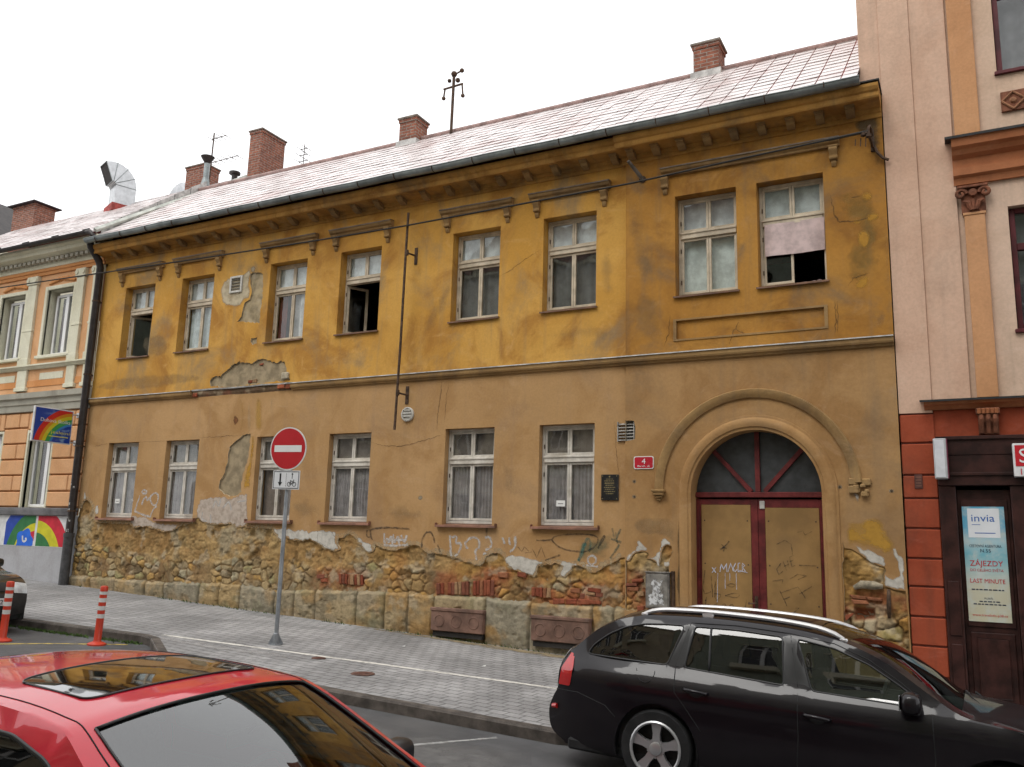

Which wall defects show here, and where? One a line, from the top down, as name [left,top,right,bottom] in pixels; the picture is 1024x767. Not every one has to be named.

peeling [221,267,263,323]
flaking render [211,359,291,389]
flaking render [72,434,673,611]
flaking render [842,548,912,653]